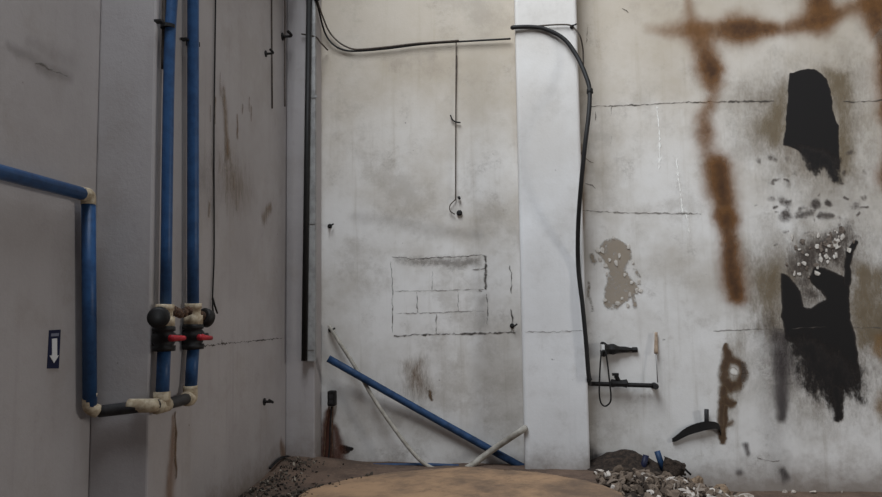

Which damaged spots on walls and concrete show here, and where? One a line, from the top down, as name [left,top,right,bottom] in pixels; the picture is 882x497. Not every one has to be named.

rust [677,0,882,304]
peeling [590,236,643,310]
peeling [786,224,855,299]
rust [168,412,177,497]
rust [321,408,344,459]